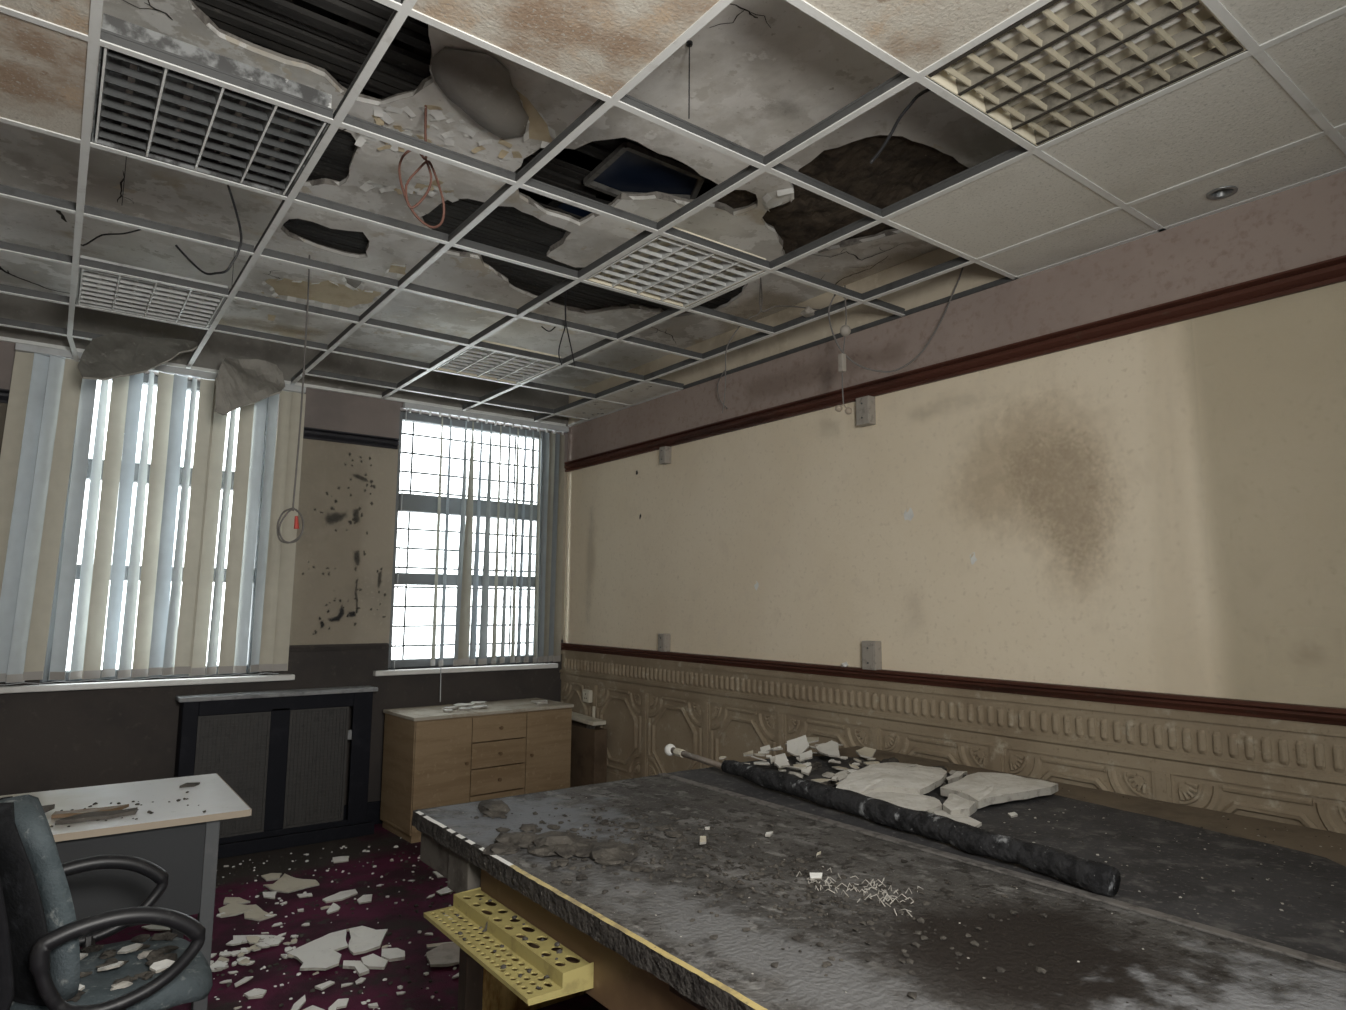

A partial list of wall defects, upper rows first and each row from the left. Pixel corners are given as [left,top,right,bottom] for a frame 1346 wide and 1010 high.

spalling [188,0,969,317]